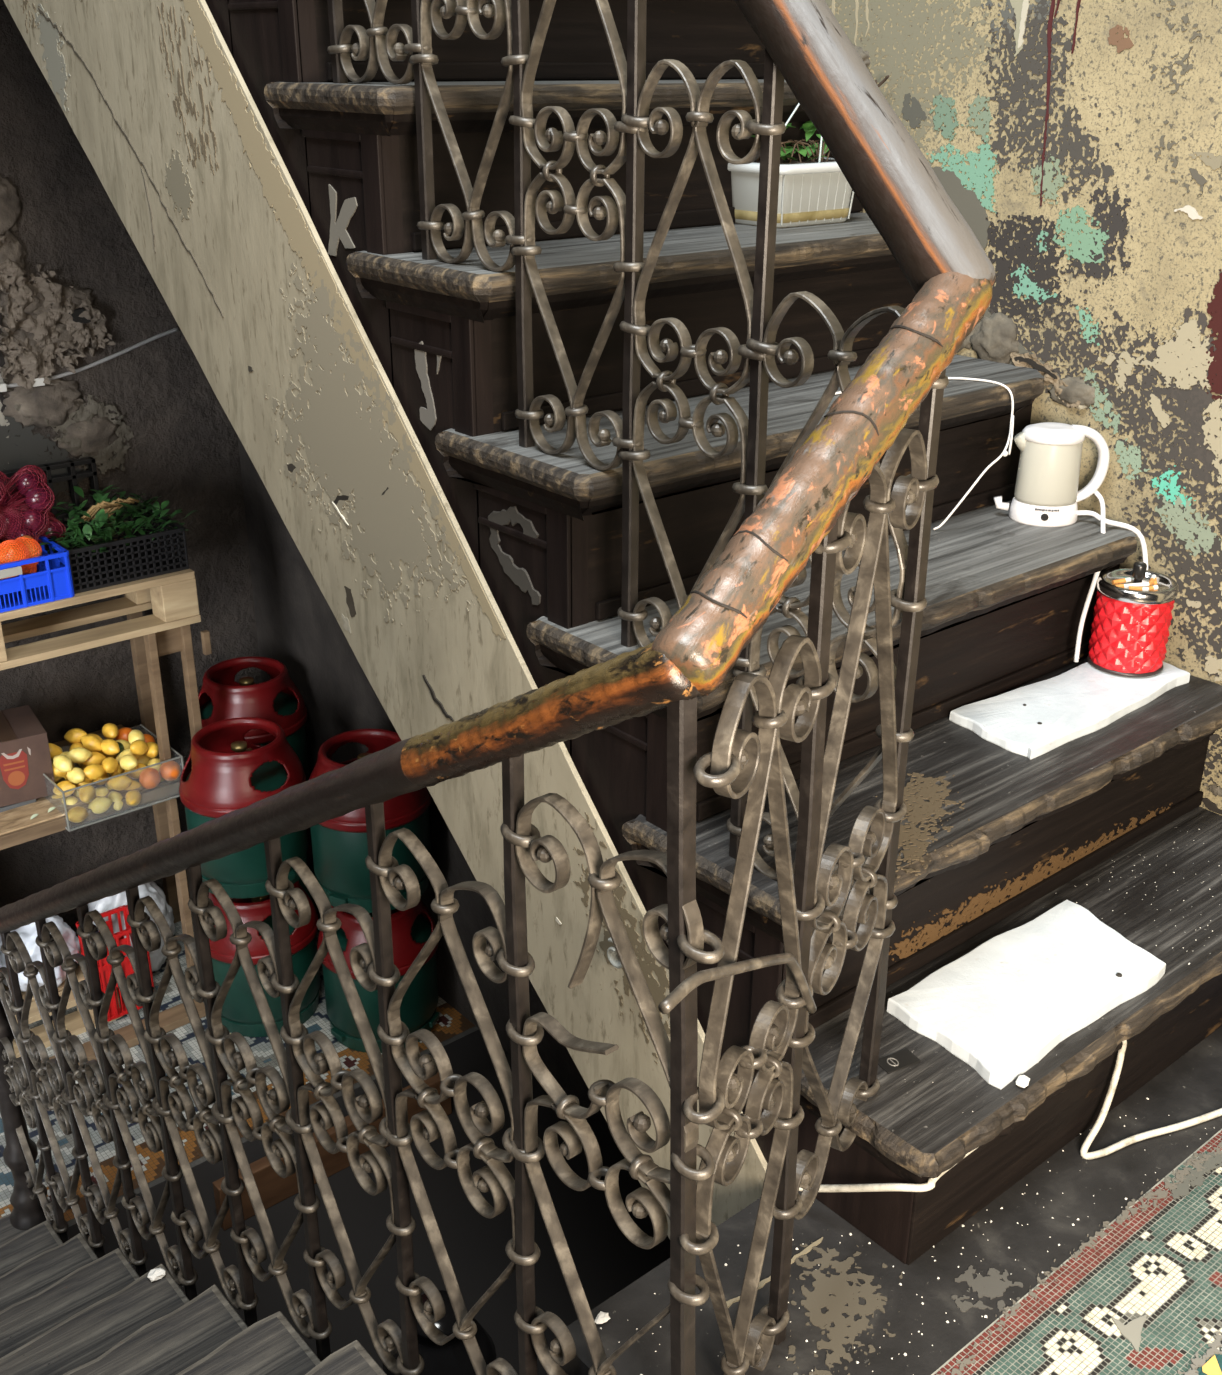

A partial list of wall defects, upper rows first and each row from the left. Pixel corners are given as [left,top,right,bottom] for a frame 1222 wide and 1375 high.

peeling [157,2,219,183]
crack [38,7,224,317]
spalling [0,174,116,389]
crack [0,313,8,412]
spalling [0,401,10,438]
spalling [342,586,356,634]
peeling [1202,730,1222,797]